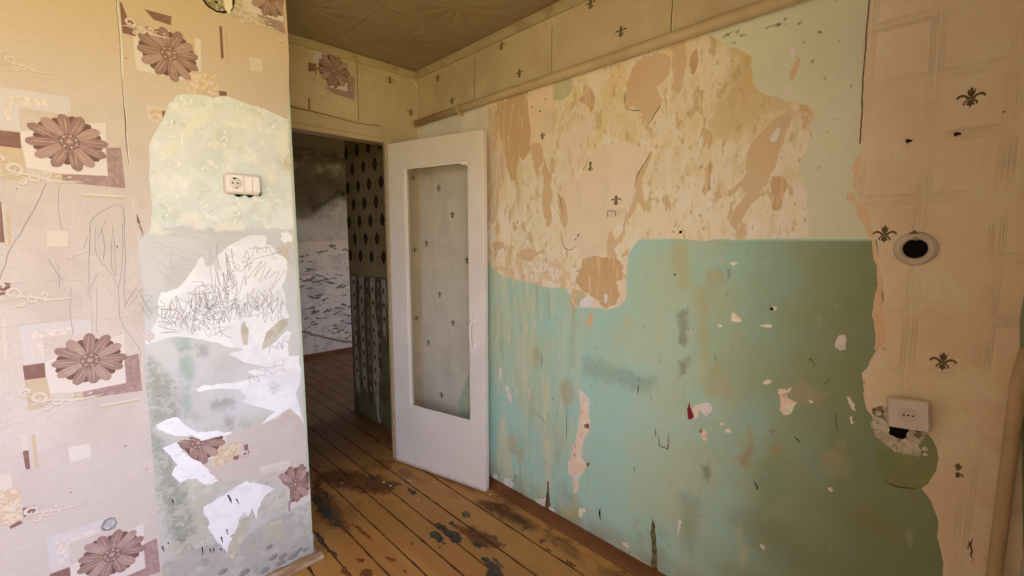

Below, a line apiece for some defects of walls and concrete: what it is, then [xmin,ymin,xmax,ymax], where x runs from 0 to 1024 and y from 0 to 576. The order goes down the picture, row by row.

peeling [162,102,293,183]
peeling [487,106,506,226]
peeling [567,280,627,327]
peeling [241,321,249,345]
peeling [263,319,288,349]
peeling [835,335,847,350]
spalling [143,330,585,576]
peeling [568,389,591,494]
peeling [687,402,712,441]
peeling [763,379,796,415]
spalling [847,344,928,457]